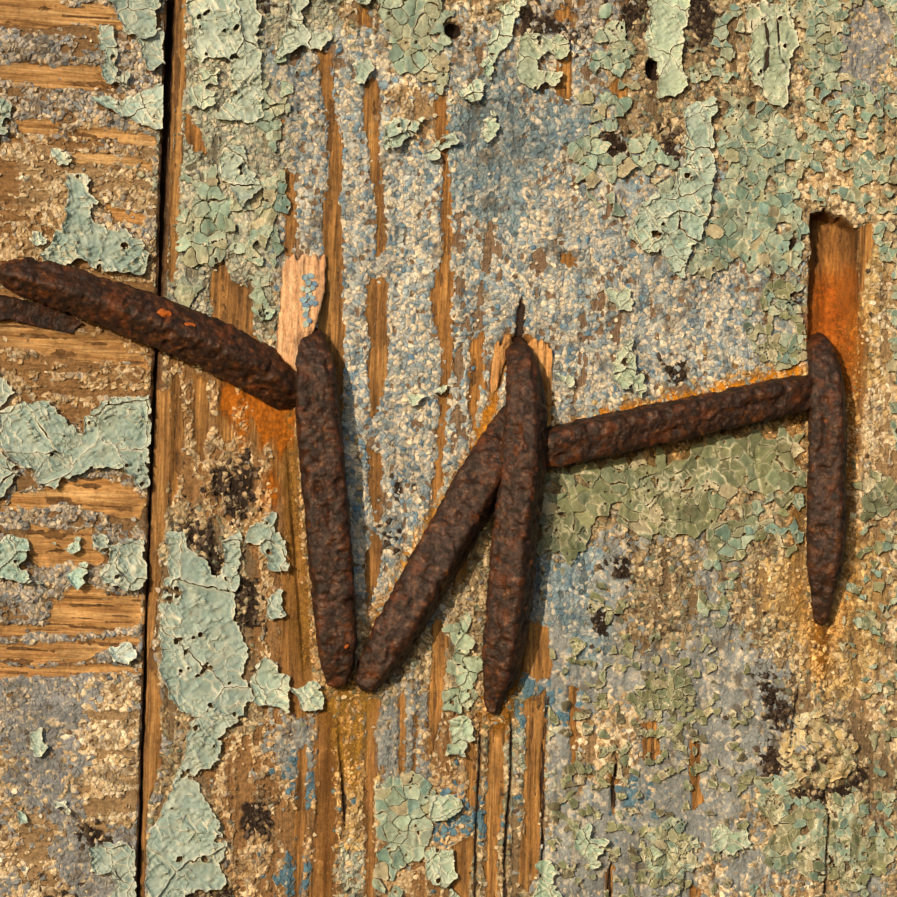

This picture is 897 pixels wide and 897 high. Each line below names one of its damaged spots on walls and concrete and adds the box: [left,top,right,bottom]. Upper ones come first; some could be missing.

peeling [0,0,264,285]
peeling [275,0,347,430]
peeling [352,58,460,518]
peeling [643,0,691,99]
peeling [627,96,718,278]
peeling [743,0,799,108]
corrosion [459,395,497,467]
corrosion [599,365,801,414]
corrosion [805,276,863,518]
peeling [0,368,337,897]
corrosion [373,480,453,619]
corrosion [476,680,517,734]